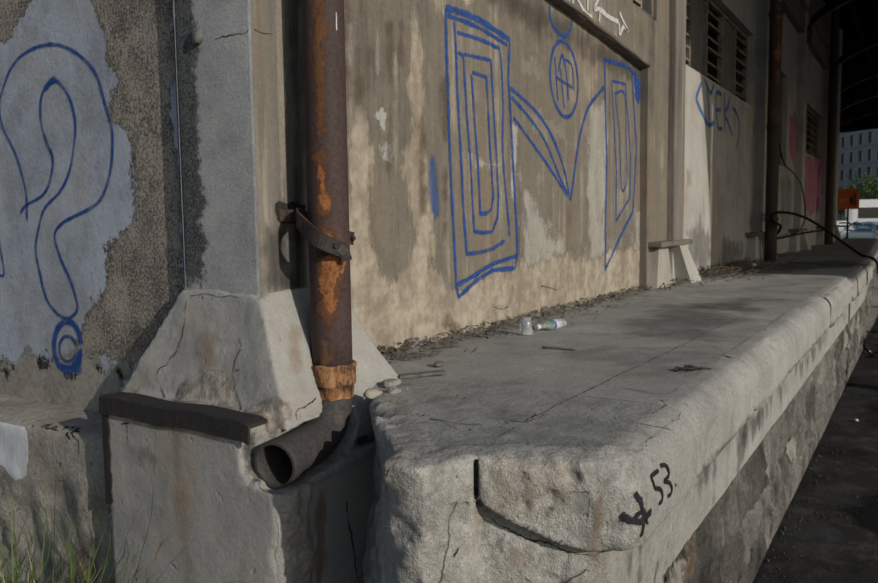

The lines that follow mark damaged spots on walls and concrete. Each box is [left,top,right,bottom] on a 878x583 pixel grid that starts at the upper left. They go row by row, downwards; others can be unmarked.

crack [215,29,270,40]
water stain [376,28,403,86]
corrosion [310,0,336,239]
peeling [0,0,184,413]
corrosion [313,251,346,326]
crack [157,293,238,399]
crack [232,338,242,410]
crack [499,318,738,436]
peeling [0,422,36,495]
crack [439,501,606,583]